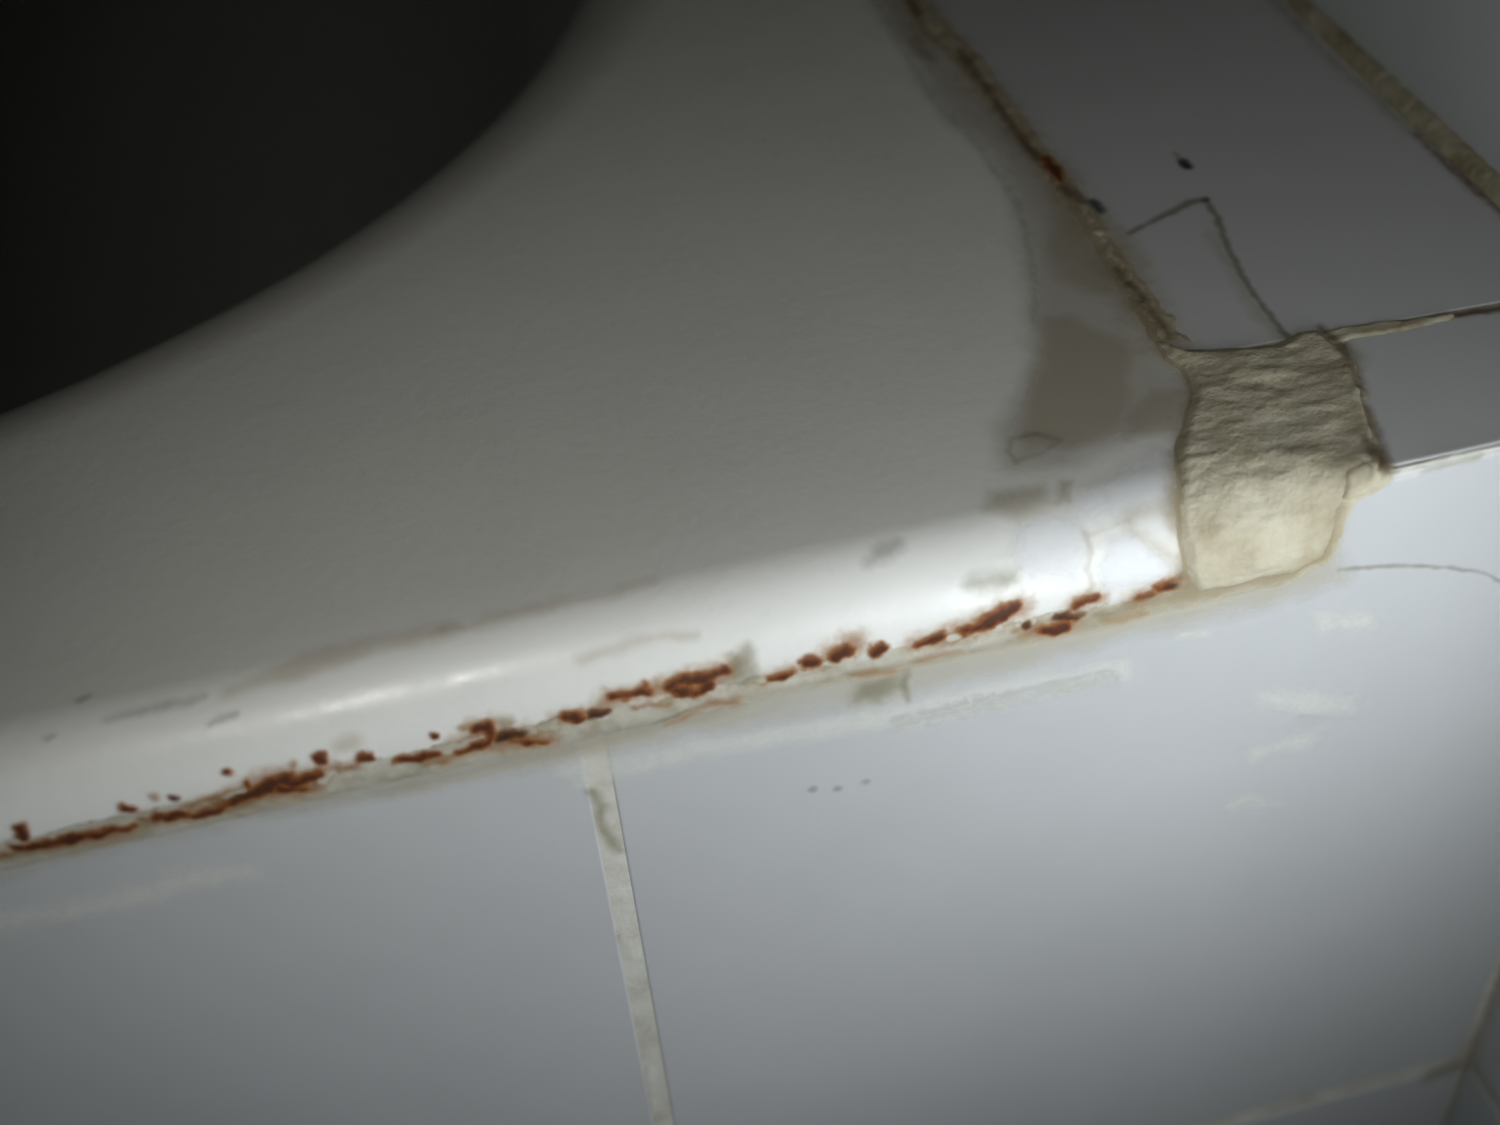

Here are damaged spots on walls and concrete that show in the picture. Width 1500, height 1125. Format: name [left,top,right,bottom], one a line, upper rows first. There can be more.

damp [909,0,1104,224]
crack [1128,198,1290,339]
rust [913,593,1102,658]
rust [1104,572,1183,622]
rust [767,638,890,682]
rust [558,665,739,725]
rust [0,719,553,856]